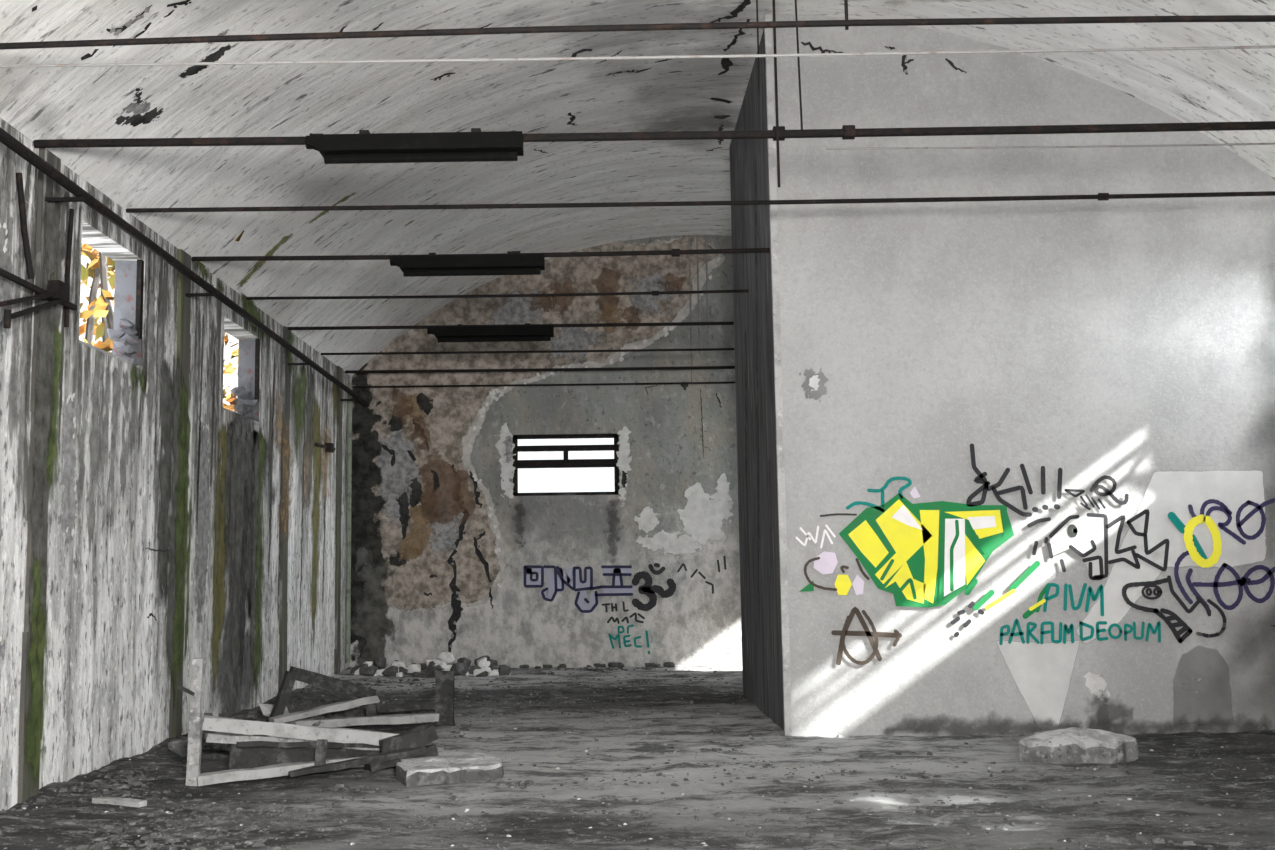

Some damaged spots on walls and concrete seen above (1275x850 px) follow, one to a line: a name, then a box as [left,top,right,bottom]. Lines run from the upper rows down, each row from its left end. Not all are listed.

crack [381,419,494,652]
peeling [352,235,734,611]